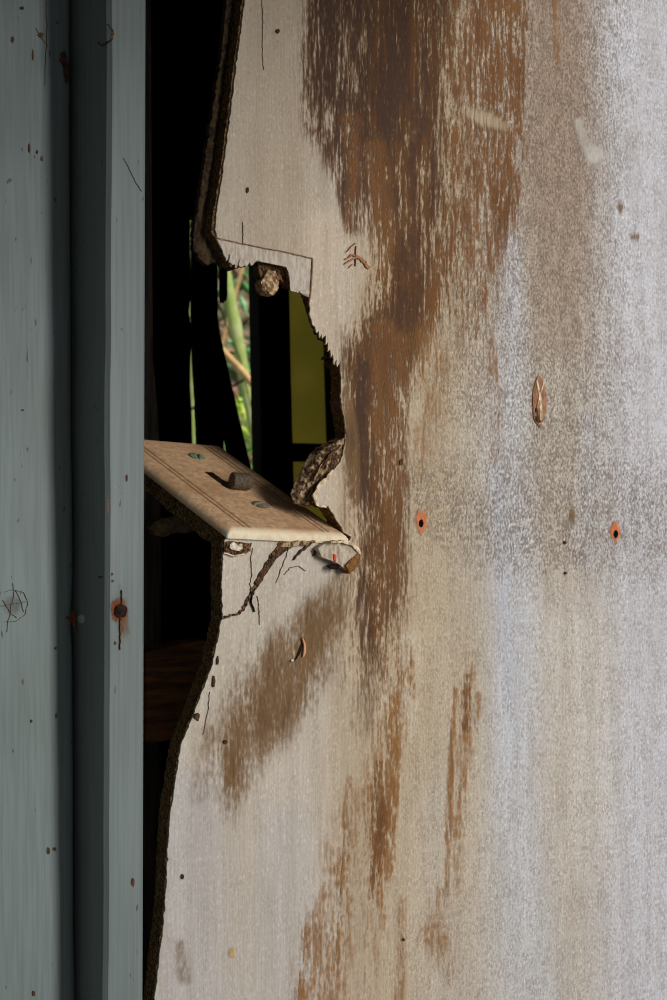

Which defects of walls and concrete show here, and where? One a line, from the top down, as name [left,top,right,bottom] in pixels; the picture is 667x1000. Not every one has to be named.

peeling [216,237,313,299]
peeling [312,470,334,508]
spalling [222,541,252,556]
peeling [313,540,361,574]
rust [416,510,427,535]
rust [610,522,621,543]
crack [220,540,321,625]
rust [112,590,128,650]
peeling [290,638,306,662]
rust [364,651,416,922]
rust [446,667,481,887]